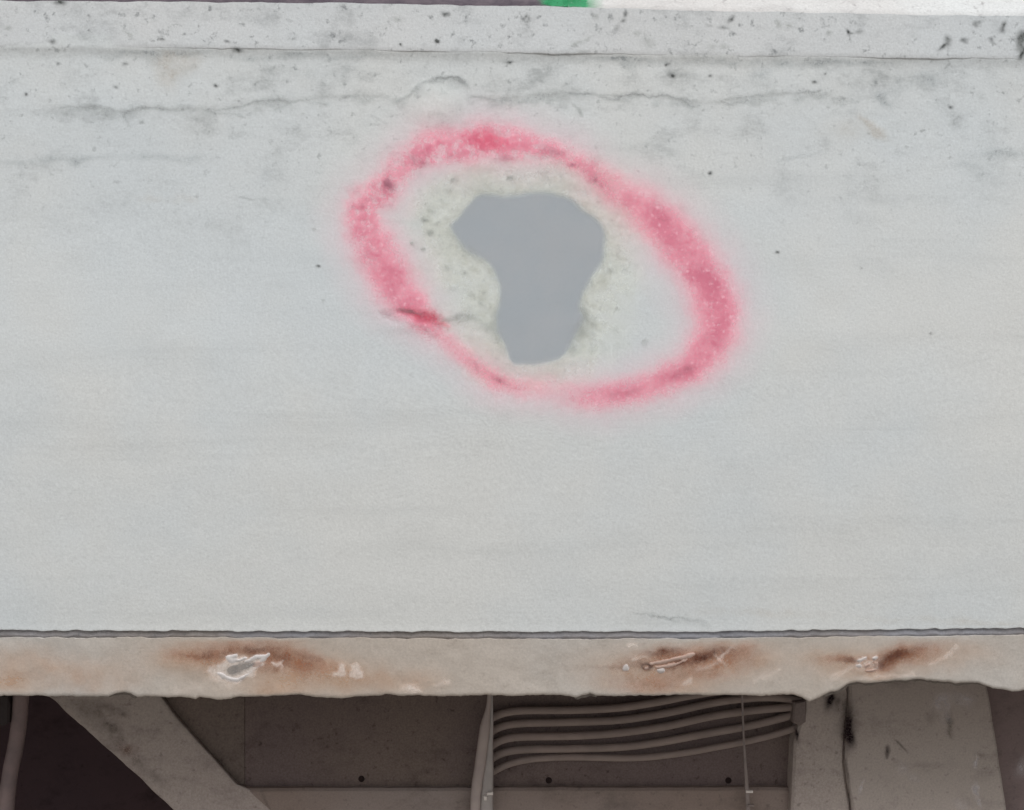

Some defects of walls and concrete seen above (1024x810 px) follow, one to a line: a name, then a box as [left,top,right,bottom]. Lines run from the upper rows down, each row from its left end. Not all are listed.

spalling [424,167,625,383]
spalling [208,652,271,683]
corrosion [660,649,729,668]
corrosion [878,649,912,669]